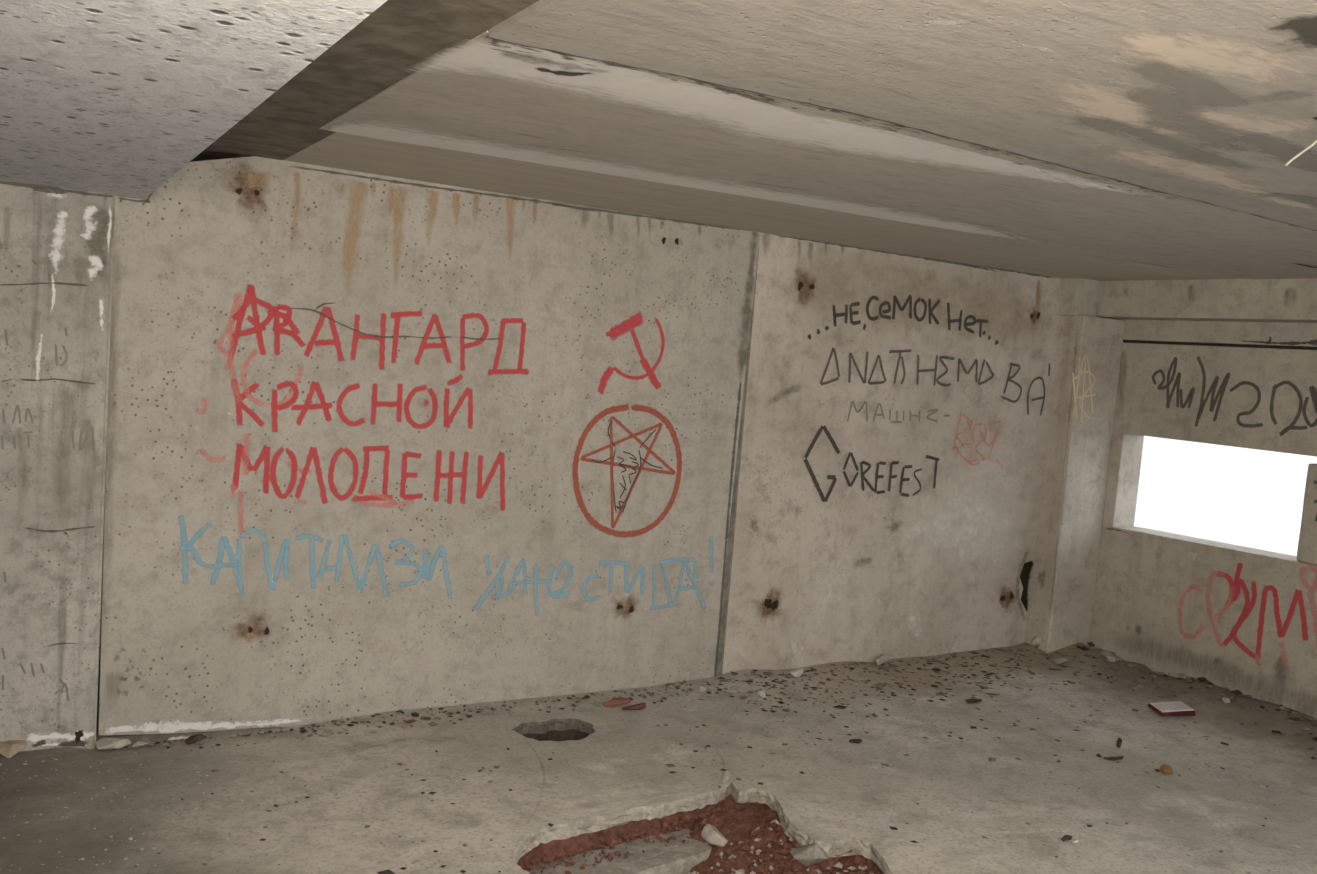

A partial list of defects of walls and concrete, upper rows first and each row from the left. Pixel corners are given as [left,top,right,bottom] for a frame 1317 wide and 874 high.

spalling [486,32,1317,231]
rust [233,171,265,207]
spalling [1020,561,1044,611]
damp [27,718,302,746]
spalling [517,794,884,874]